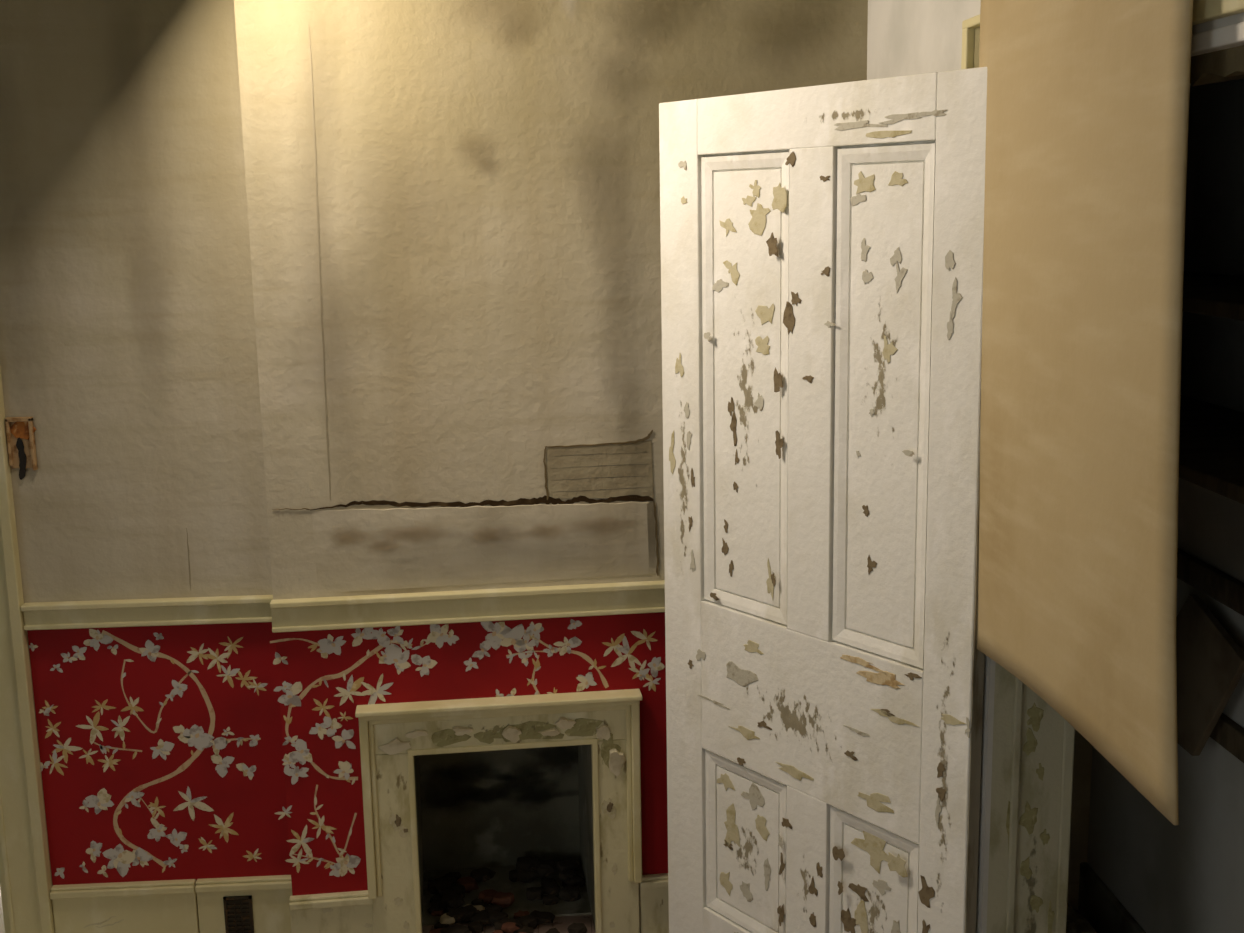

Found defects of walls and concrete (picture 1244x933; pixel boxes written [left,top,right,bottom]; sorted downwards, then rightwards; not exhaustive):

peeling [822,109,947,138]
peeling [719,180,787,257]
peeling [850,171,908,206]
crack [272,24,659,576]
peeling [728,292,801,466]
peeling [865,315,898,417]
peeling [669,402,696,572]
peeling [729,690,870,751]
peeling [840,655,922,689]
peeling [935,660,971,851]
peeling [717,773,792,902]
peeling [832,831,939,933]